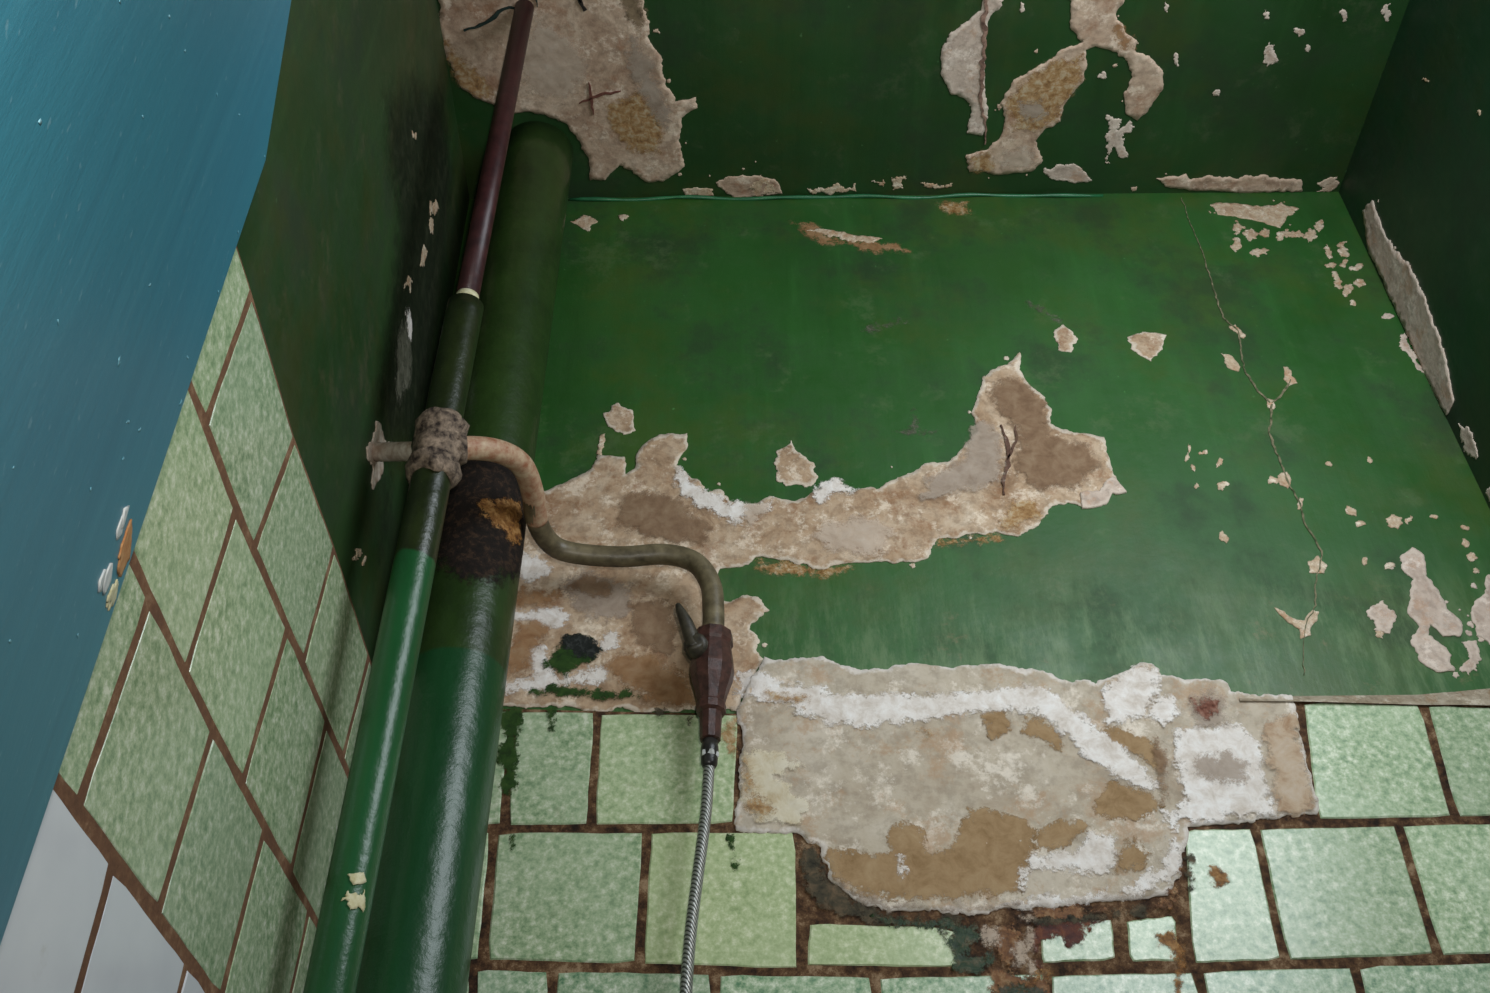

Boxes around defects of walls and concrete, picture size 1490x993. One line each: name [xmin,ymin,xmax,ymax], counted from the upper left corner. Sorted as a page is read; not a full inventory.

crack [463,0,538,32]
peeling [438,0,782,197]
peeling [807,228,882,243]
peeling [807,176,952,195]
peeling [941,0,1164,183]
peeling [1156,173,1478,459]
peeling [544,352,1127,573]
peeling [503,524,702,712]
peeling [1366,547,1490,679]
spalling [724,595,1319,916]
damp [795,842,1182,993]
rust [1028,904,1107,969]